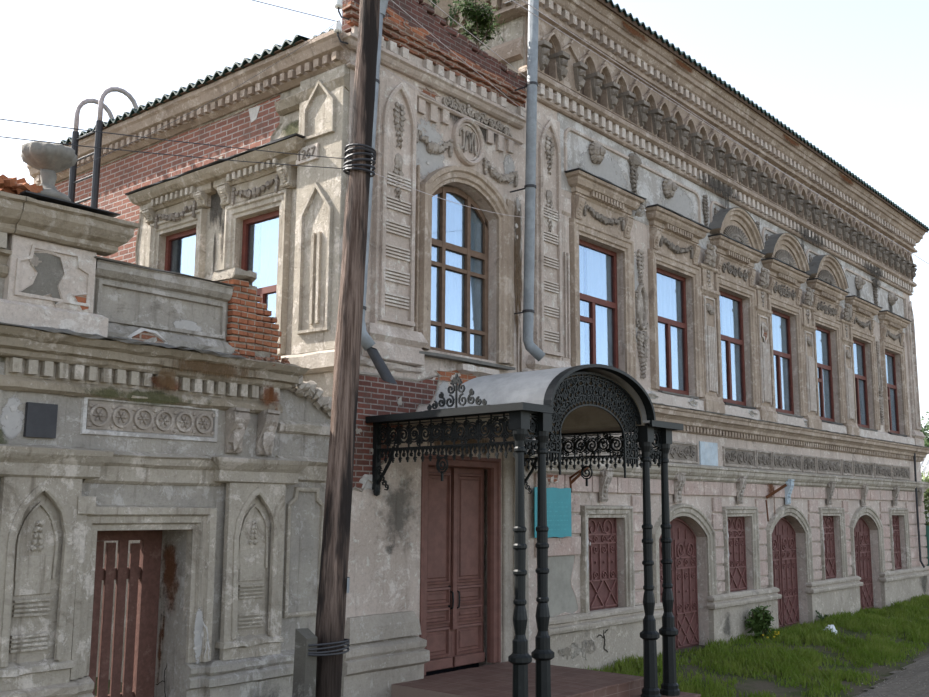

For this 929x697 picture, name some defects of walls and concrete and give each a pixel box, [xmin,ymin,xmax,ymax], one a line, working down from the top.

damp [389,485,411,531]
rust [157,545,179,680]